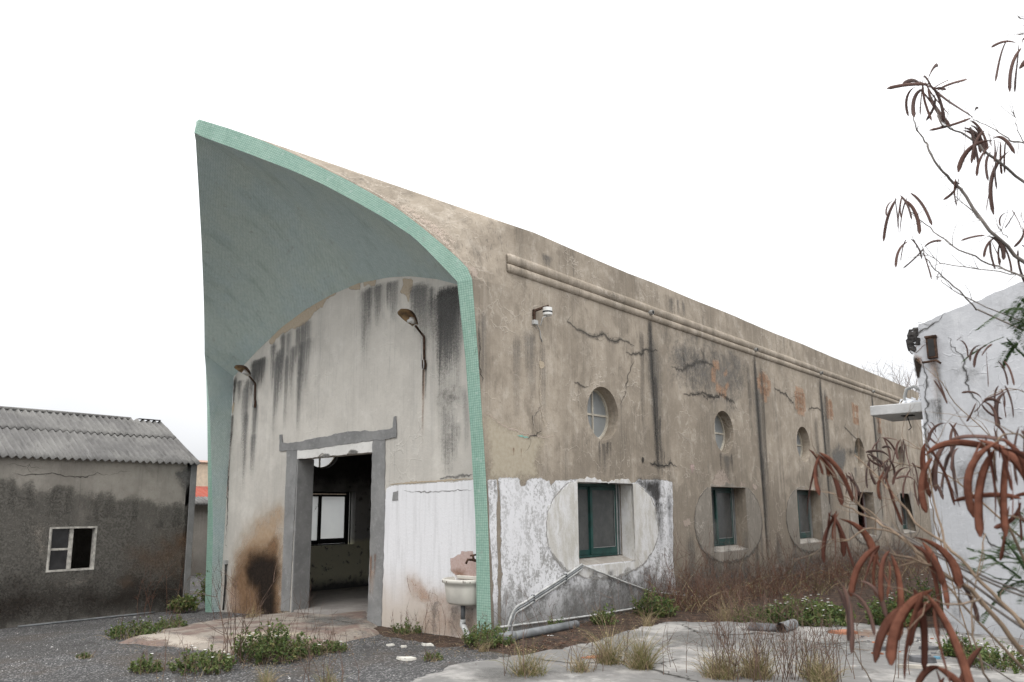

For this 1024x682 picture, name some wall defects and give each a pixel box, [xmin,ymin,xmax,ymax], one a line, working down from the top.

water stain [414,286,457,336]
crack [568,310,734,406]
water stain [648,323,661,459]
water stain [0,479,188,626]
peeling [486,413,691,631]